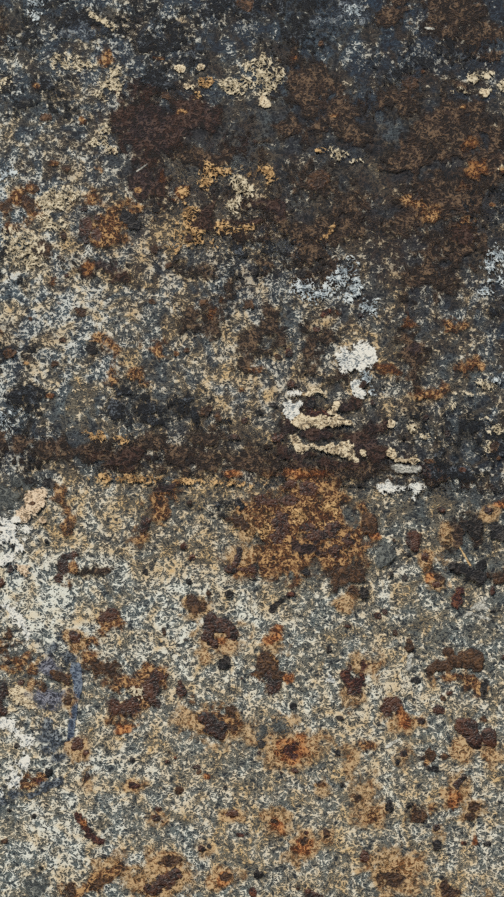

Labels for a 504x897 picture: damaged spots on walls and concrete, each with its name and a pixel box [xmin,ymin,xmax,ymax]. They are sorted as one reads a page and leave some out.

rust [0,182,43,235]
rust [31,239,132,286]
rust [78,37,504,402]
rust [0,255,504,628]
rust [182,579,245,670]
rust [0,626,76,716]
rust [63,607,393,829]
rust [379,647,489,735]
rust [20,768,53,790]
rust [405,715,504,851]
rust [57,812,192,897]
rust [355,848,461,897]